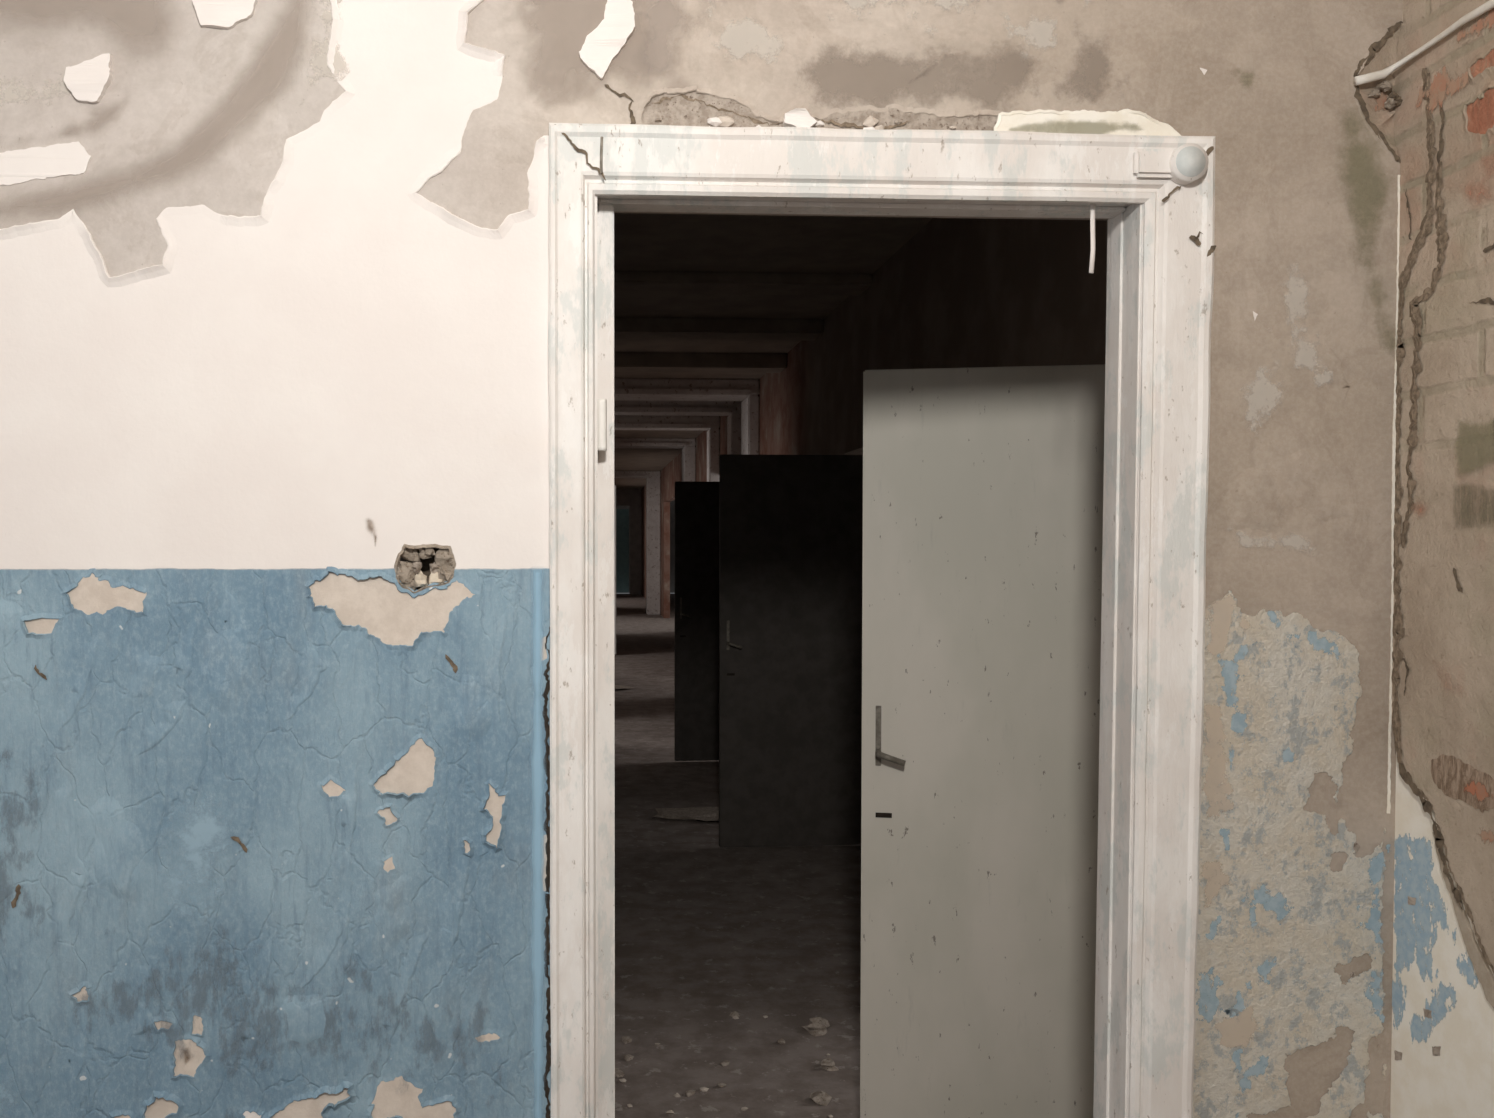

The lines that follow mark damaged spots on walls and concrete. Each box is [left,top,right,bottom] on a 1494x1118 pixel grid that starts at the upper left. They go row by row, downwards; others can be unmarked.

peeling [0,0,355,287]
leakage [312,40,346,81]
peeling [407,0,635,240]
leakage [530,0,607,91]
crack [605,84,636,124]
leakage [611,3,650,73]
leakage [812,16,1057,105]
crack [1470,297,1494,305]
crack [1391,68,1449,763]
peeling [304,544,480,651]
peeling [1193,8,1494,1118]
crack [1453,568,1463,593]